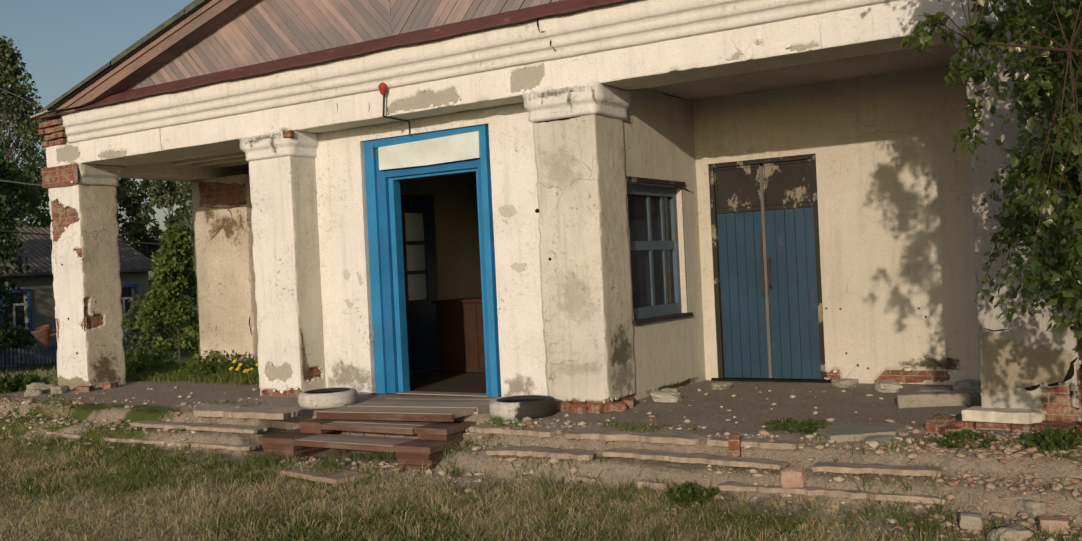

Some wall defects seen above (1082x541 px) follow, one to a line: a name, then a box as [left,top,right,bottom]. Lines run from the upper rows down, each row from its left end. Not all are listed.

flaking render [510,63,545,93]
flaking render [386,86,461,114]
flaking render [95,150,127,159]
flaking render [38,118,82,245]
flaking render [197,181,247,207]
flaking render [56,298,103,340]
flaking render [856,364,953,384]
flaking render [979,329,1082,423]